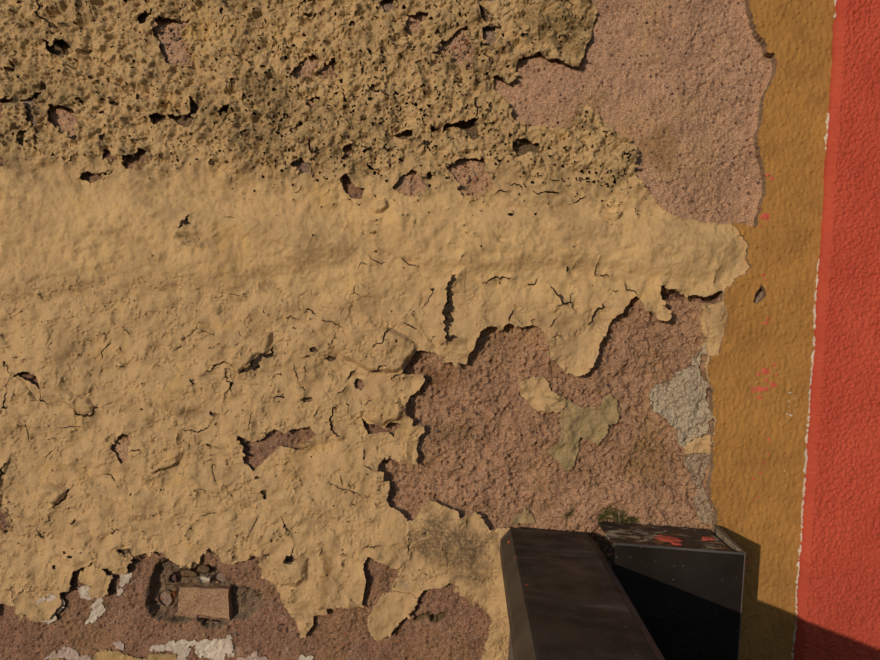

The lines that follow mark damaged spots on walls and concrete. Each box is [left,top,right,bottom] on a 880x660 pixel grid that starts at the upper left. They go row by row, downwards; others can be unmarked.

peeling [432,0,501,73]
peeling [150,98,235,134]
peeling [442,103,491,140]
peeling [490,0,773,227]
peeling [76,134,161,183]
peeling [340,173,365,201]
peeling [385,156,494,204]
crack [482,276,573,338]
crack [572,263,637,326]
crack [314,275,458,437]
peeling [362,285,722,554]
peeling [0,548,491,660]